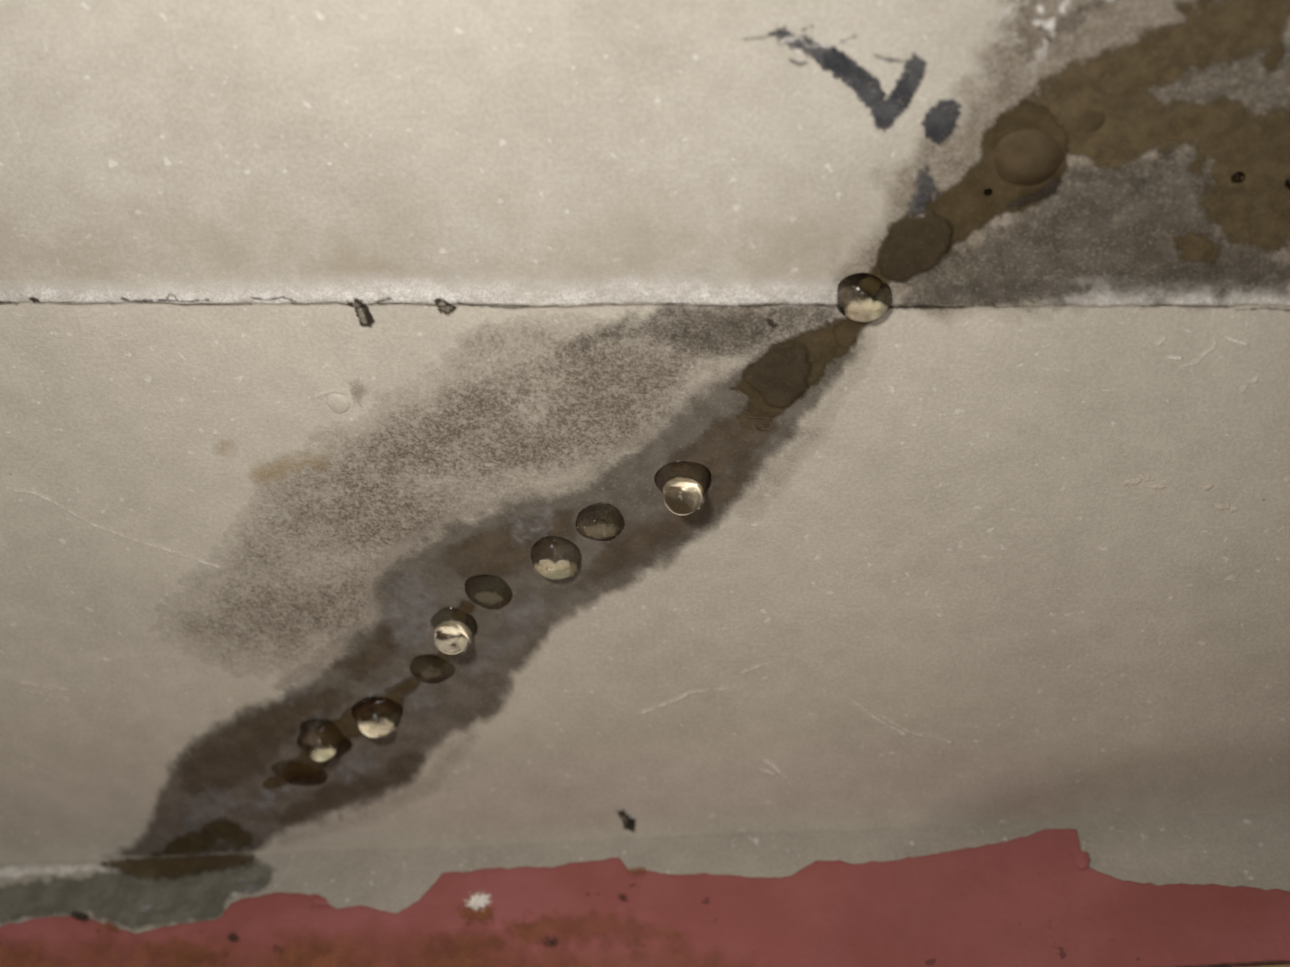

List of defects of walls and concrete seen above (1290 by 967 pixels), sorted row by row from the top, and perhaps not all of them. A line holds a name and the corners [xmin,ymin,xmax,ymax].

water stain [845,0,1290,312]
water stain [0,276,871,928]
spalling [618,810,635,832]
peeling [0,828,1290,967]